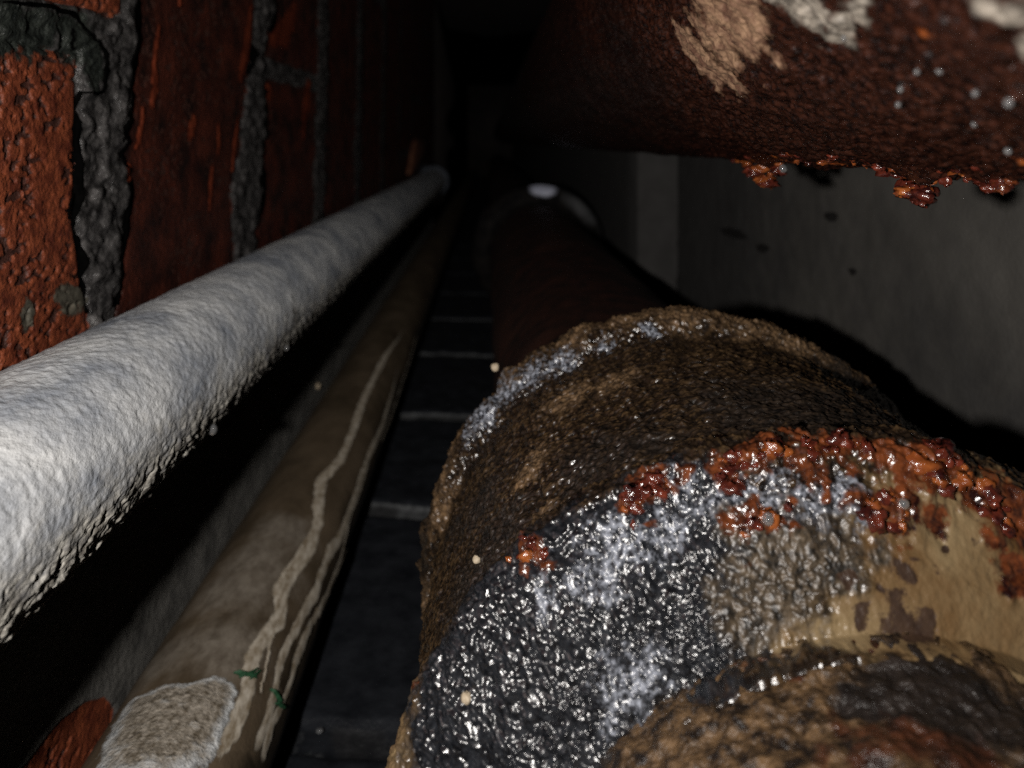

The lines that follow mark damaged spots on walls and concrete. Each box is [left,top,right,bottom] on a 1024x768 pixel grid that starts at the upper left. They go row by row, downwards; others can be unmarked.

rust [729,152,1020,209]
rust [617,469,671,530]
rust [739,501,793,538]
rust [714,428,875,498]
rust [855,488,911,535]
rust [906,437,1018,539]
rust [505,534,548,563]